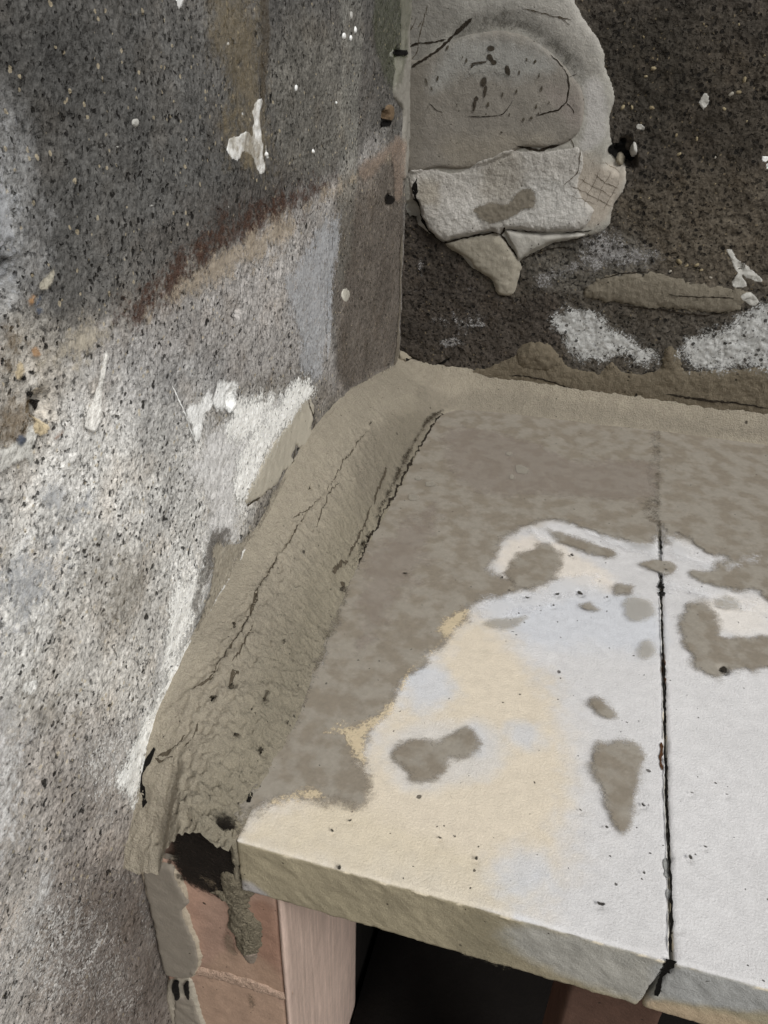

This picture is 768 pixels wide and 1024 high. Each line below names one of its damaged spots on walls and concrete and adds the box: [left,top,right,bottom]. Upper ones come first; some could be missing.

crack [410,5,472,68]
crack [527,9,572,24]
crack [539,55,576,115]
crack [518,140,581,185]
crack [412,178,591,259]
crack [619,294,729,317]
crack [359,410,444,564]
crack [194,432,366,688]
leakage [235,410,768,835]
crack [654,521,677,996]